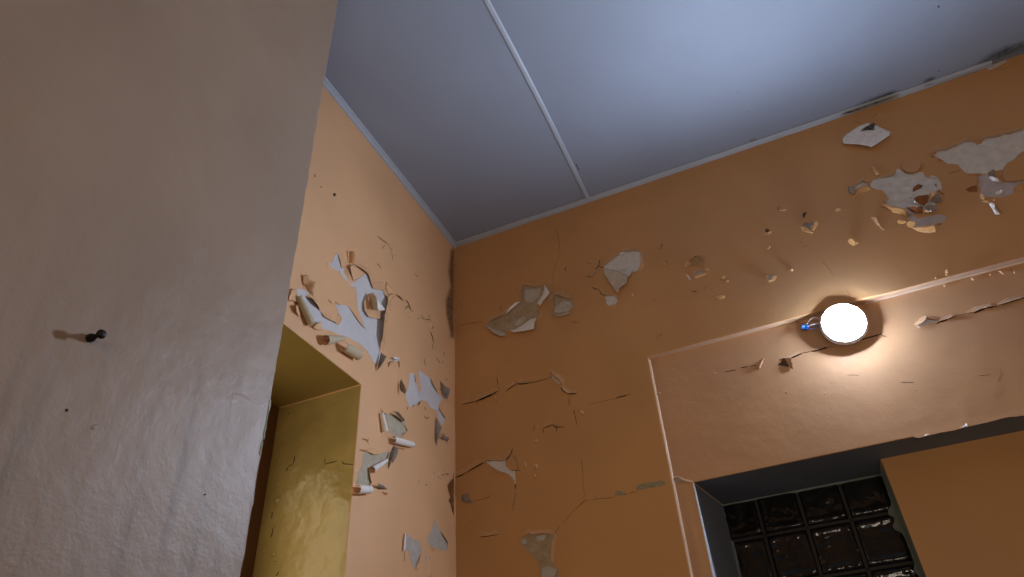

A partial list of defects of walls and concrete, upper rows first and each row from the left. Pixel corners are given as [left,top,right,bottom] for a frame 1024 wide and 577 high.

peeling [843,123,891,147]
peeling [848,128,1024,233]
peeling [592,248,645,309]
peeling [289,251,450,494]
peeling [485,281,574,336]
crack [714,345,833,374]
crack [861,332,887,340]
crack [461,371,630,433]
crack [455,447,521,508]
spalling [403,520,448,571]
spalling [519,530,559,577]